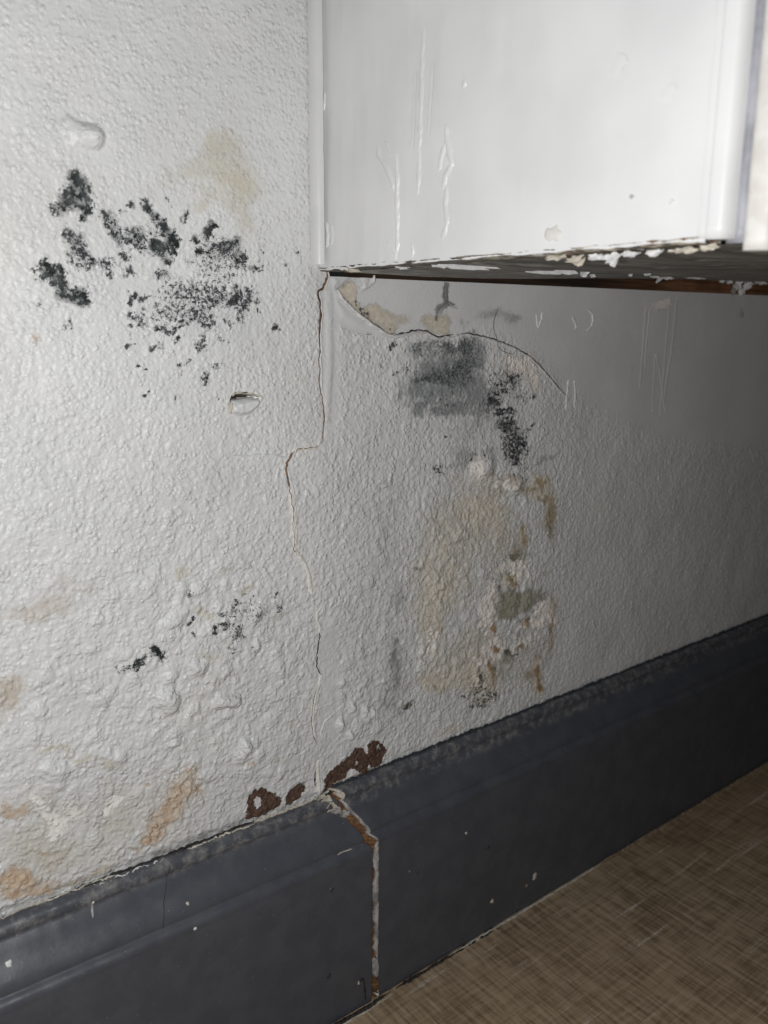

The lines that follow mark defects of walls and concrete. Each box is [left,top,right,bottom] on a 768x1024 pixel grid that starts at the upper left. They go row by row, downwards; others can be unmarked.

water stain [31,168,265,376]
peeling [329,267,453,345]
peeling [525,243,721,278]
peeling [719,280,767,296]
hole [227,391,263,418]
water stain [393,339,558,712]
crack [233,272,379,996]